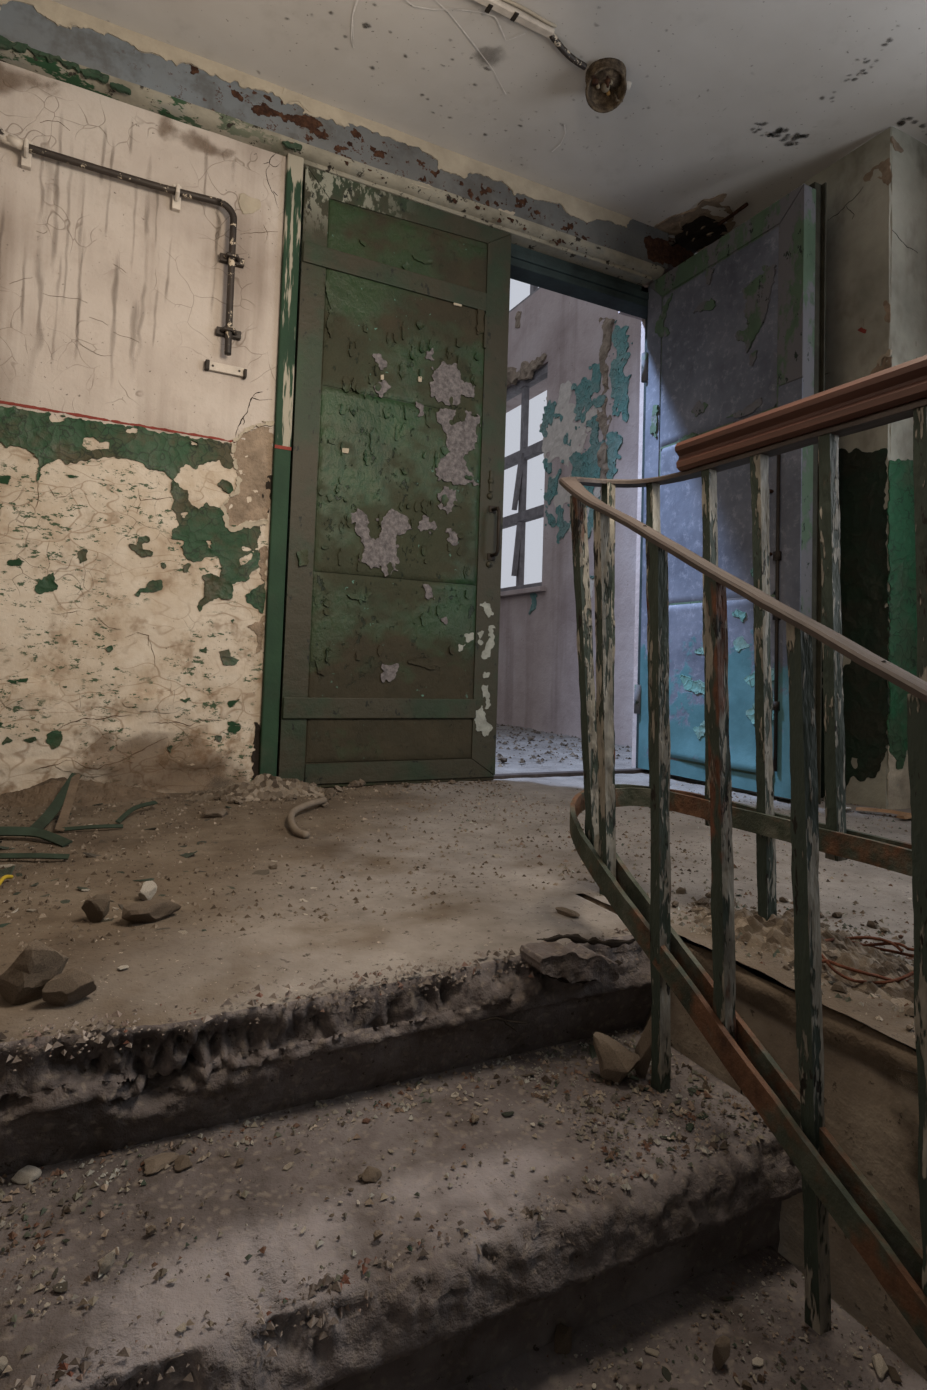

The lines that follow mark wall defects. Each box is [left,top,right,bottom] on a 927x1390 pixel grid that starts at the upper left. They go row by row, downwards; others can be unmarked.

water stain [193,137,216,153]
rust [231,89,393,179]
peeling [0,0,632,228]
rust [416,159,540,230]
rust [552,220,587,257]
spalling [654,193,749,254]
peeling [351,348,481,577]
peeling [539,317,633,544]
peeling [0,406,275,653]
peeling [2,730,63,749]
water stain [92,736,243,793]
spalling [0,928,639,1071]